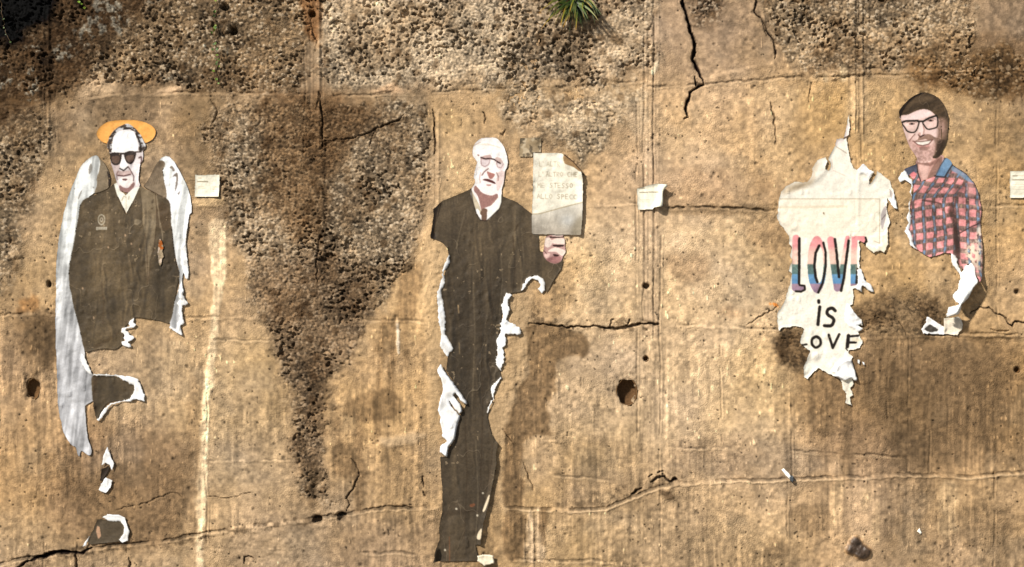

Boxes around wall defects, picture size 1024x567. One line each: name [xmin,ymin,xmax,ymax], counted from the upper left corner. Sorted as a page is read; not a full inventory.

crack [680,0,705,120]
leakage [301,256,429,519]
leakage [495,248,597,567]
leakage [798,317,1024,553]